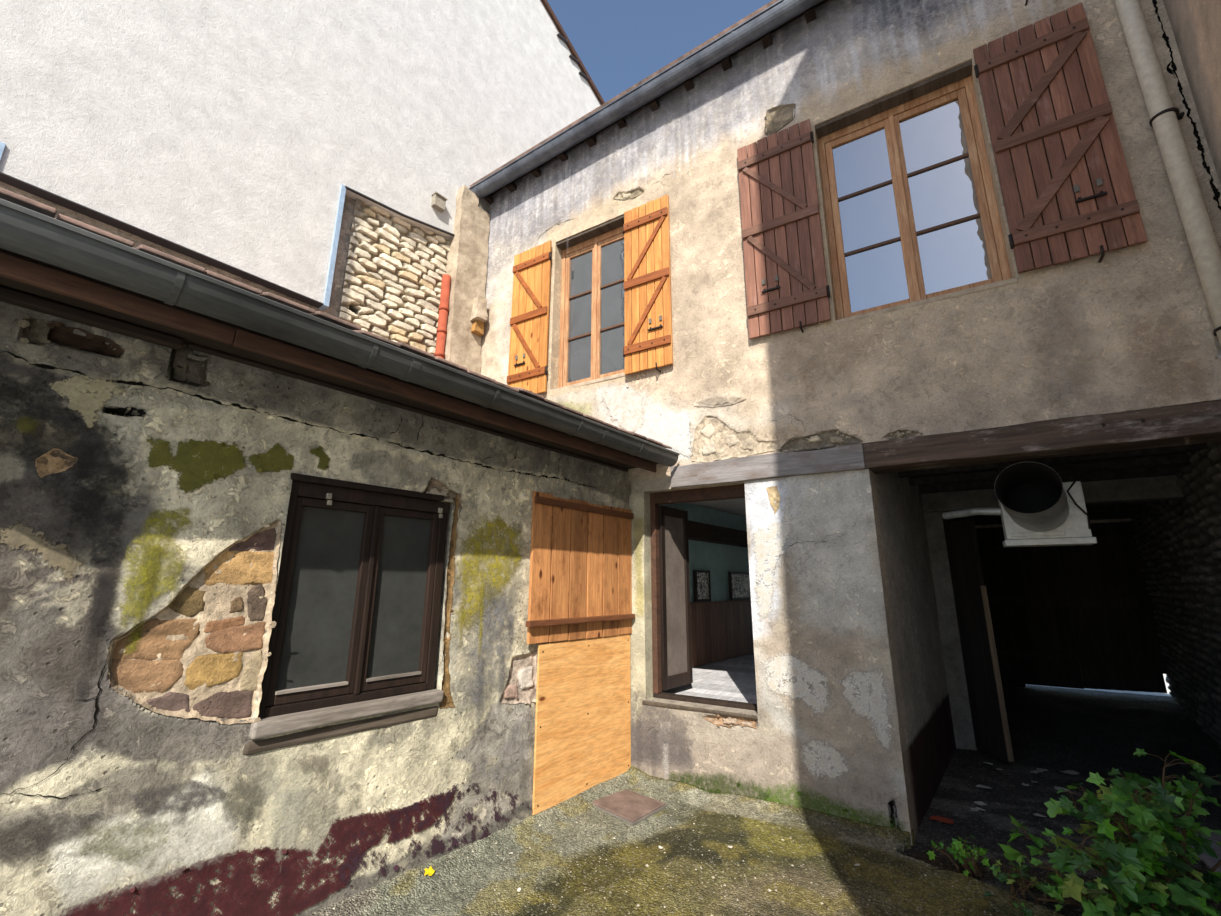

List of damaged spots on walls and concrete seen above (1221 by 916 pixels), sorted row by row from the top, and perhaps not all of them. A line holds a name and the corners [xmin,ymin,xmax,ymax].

flaking render [764,104,796,135]
crack [1152,0,1221,210]
crack [0,351,596,488]
flaking render [601,383,863,462]
water stain [0,377,137,655]
flaking render [108,520,281,725]
crack [3,627,123,799]
peeling [797,740,851,780]
peeling [761,653,893,750]
peeling [59,782,531,916]